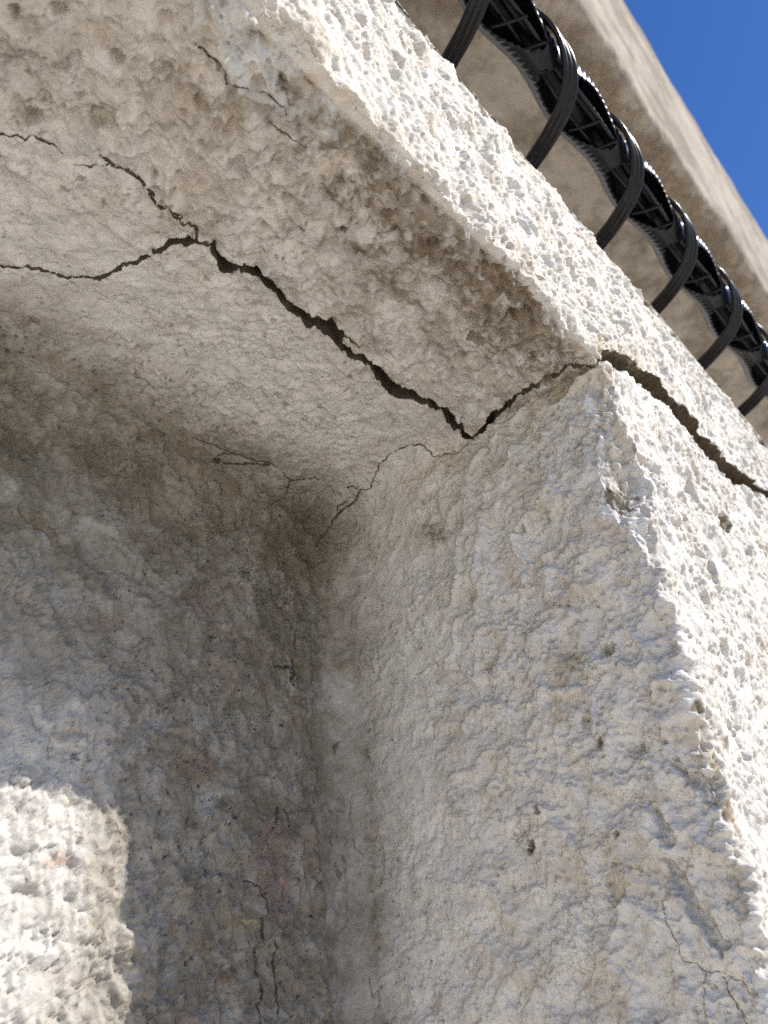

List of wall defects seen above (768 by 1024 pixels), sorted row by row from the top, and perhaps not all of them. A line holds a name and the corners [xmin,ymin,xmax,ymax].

crack [0,133,768,546]